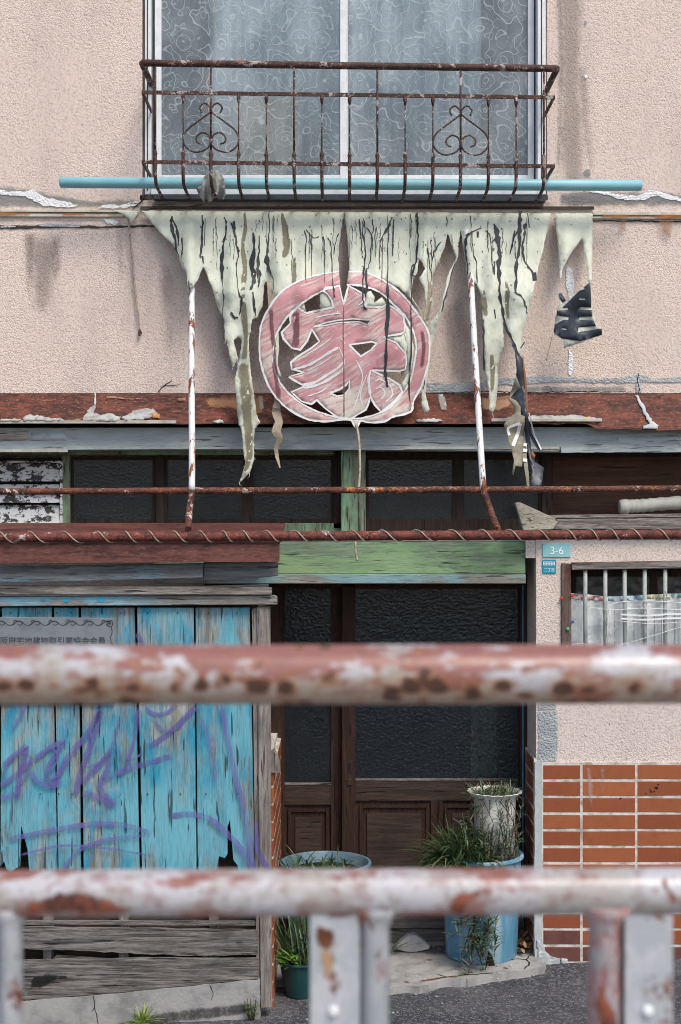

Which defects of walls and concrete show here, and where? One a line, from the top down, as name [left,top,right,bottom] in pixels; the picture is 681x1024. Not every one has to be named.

corrosion [206,398,237,410]
corrosion [254,396,264,413]
corrosion [482,398,510,410]
peeling [635,395,659,429]
corrosion [28,893,130,914]
corrosion [450,890,491,914]
corrosion [317,927,334,978]